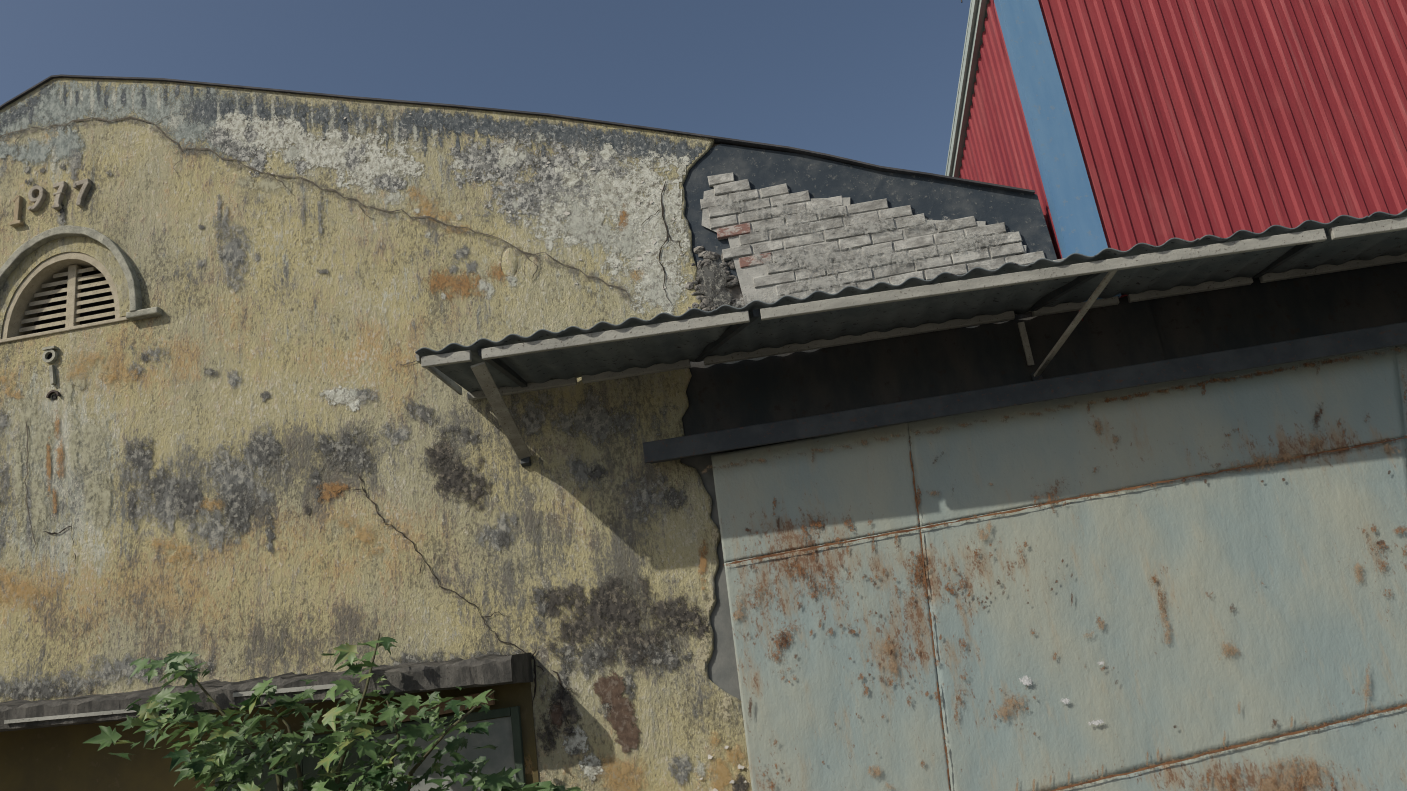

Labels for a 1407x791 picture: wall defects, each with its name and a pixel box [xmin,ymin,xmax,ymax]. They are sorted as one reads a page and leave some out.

crack [0,113,634,303]
flaking render [197,112,1065,315]
crack [641,181,682,303]
rust [46,416,65,513]
water stain [0,377,289,560]
water stain [204,368,242,389]
peeling [320,385,378,411]
water stain [306,398,517,551]
crack [334,475,570,724]
water stain [529,575,709,756]
rust [723,409,1407,791]